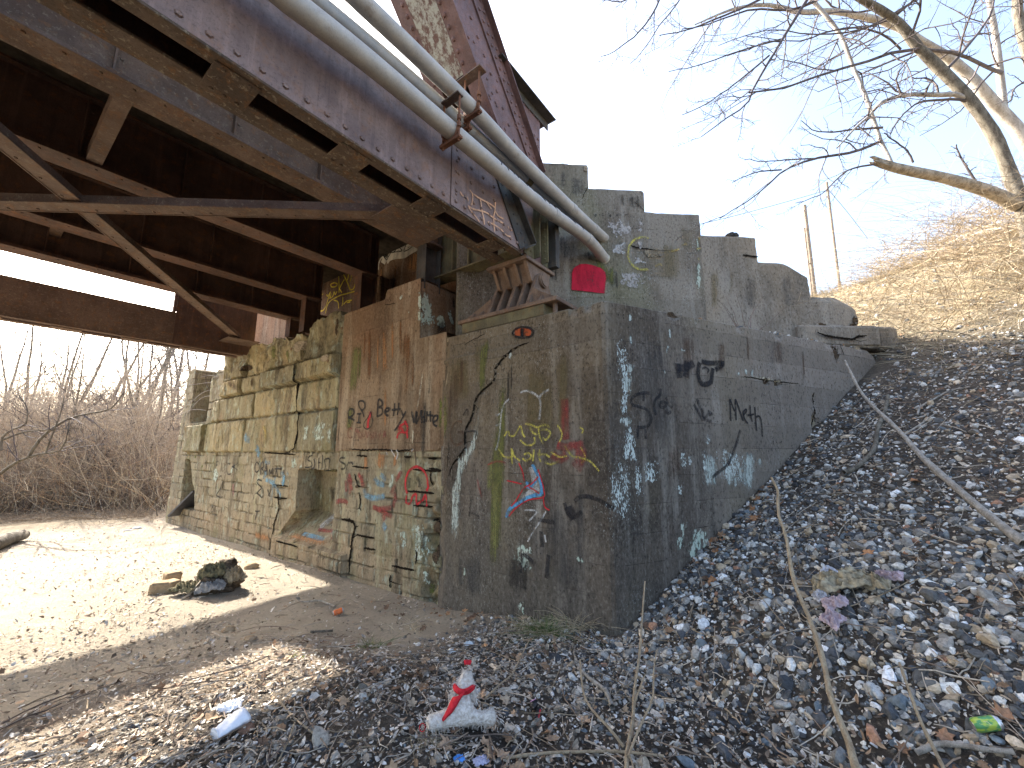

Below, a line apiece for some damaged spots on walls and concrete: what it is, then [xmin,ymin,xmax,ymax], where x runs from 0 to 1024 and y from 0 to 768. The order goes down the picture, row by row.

crack [446,342,529,479]
leakage [605,337,660,518]
crack [269,489,286,550]
crack [342,446,413,573]